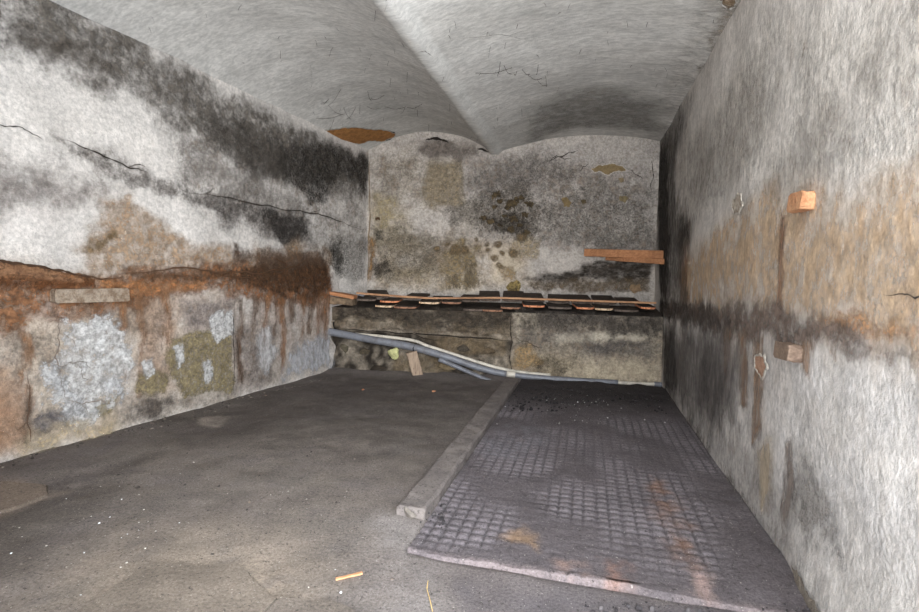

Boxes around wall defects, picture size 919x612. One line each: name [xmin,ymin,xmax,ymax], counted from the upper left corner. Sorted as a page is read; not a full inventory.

crack [70,141,148,173]
flaking render [325,126,396,144]
damp [87,196,482,290]
damp [422,158,653,258]
corrosion [0,244,332,381]
damp [22,403,112,448]
damp [139,398,170,417]
damp [660,298,893,518]